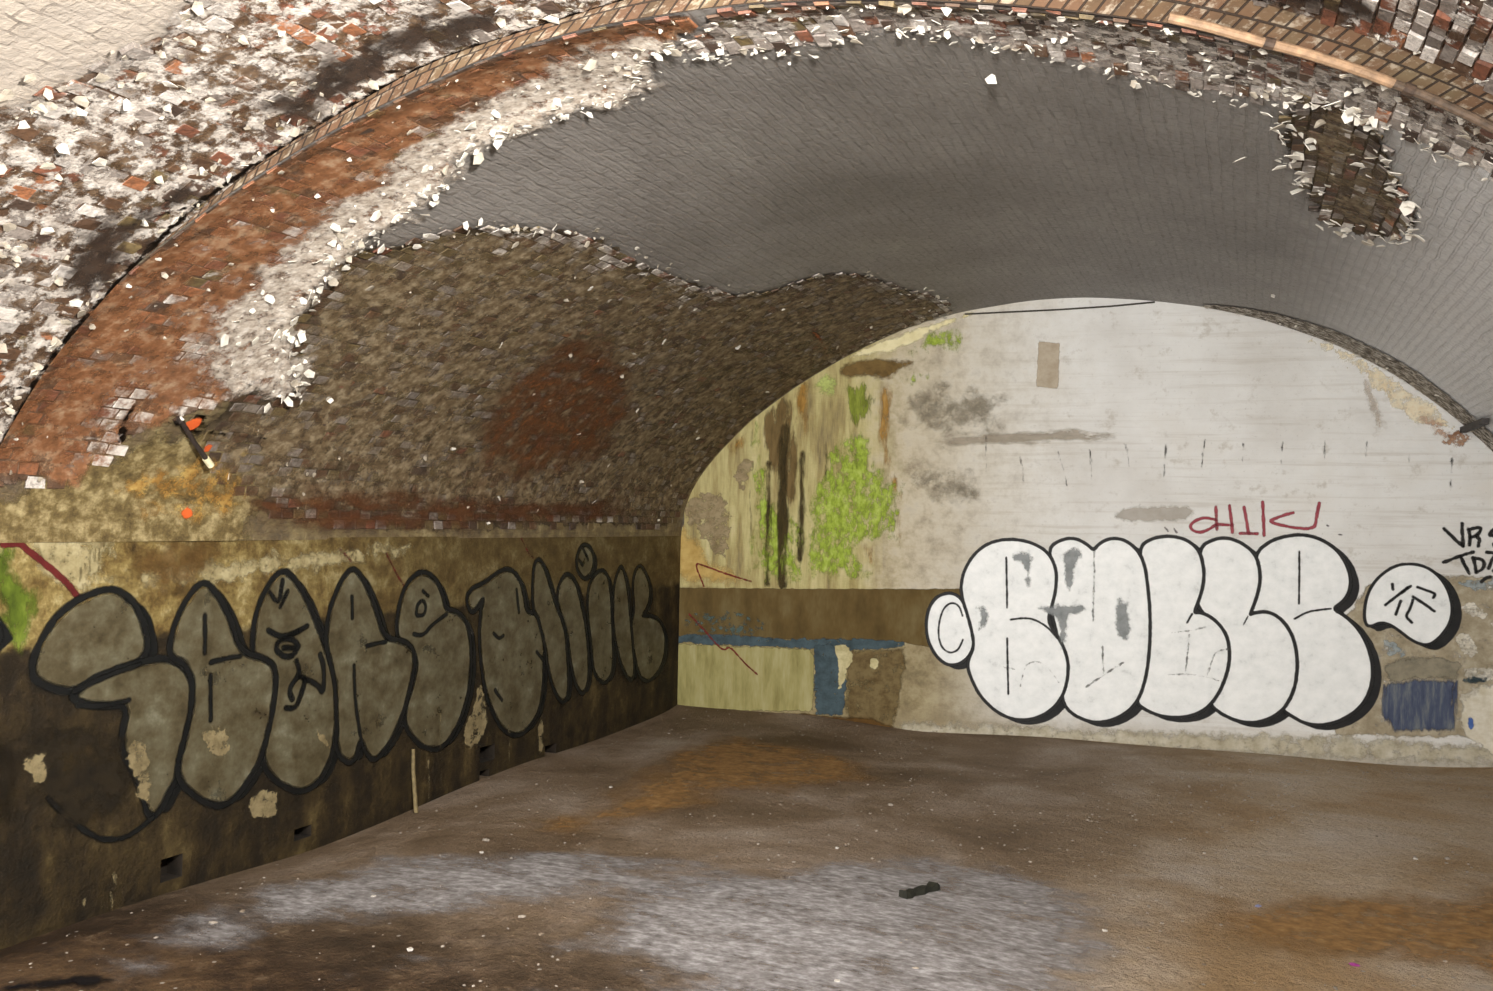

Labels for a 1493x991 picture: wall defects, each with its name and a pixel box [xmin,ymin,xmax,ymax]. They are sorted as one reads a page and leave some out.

spalling [0,0,1493,591]
leakage [764,397,805,589]
peeling [835,645,879,689]
peeling [1455,602,1493,681]